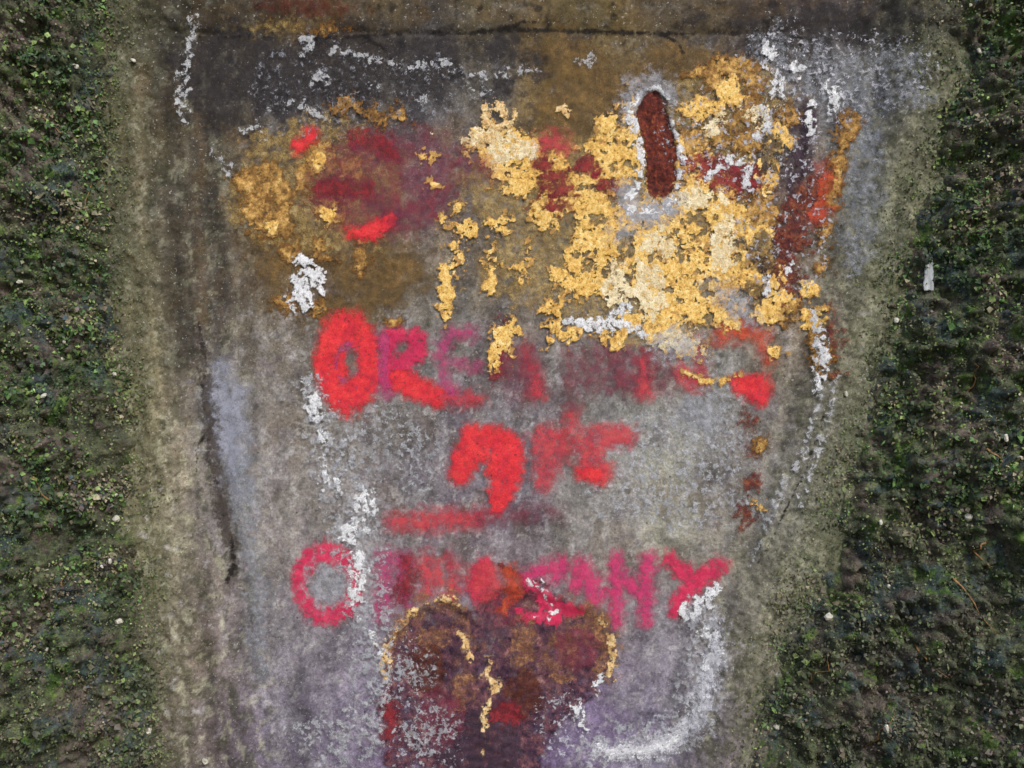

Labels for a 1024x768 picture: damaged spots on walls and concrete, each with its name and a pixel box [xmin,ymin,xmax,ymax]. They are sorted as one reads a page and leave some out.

peeling [415,146,445,190]
peeling [431,48,868,392]
damp [206,362,273,684]